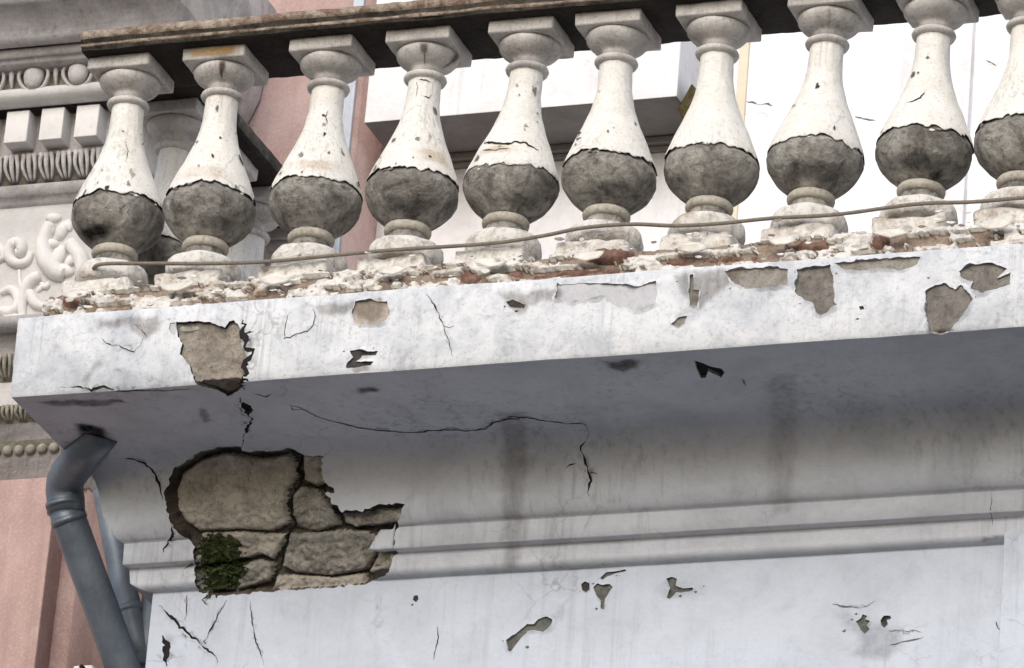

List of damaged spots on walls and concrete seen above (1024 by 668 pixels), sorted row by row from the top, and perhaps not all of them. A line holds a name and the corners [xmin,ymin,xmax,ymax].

peeling [71,114,1024,254]
peeling [438,210,1014,336]
crack [426,294,453,356]
spalling [167,318,253,414]
crack [237,320,597,497]
crack [126,458,163,500]
spalling [164,447,405,596]
peeling [579,564,627,611]
peeling [664,576,704,600]
crack [158,596,264,667]
peeling [502,615,556,654]